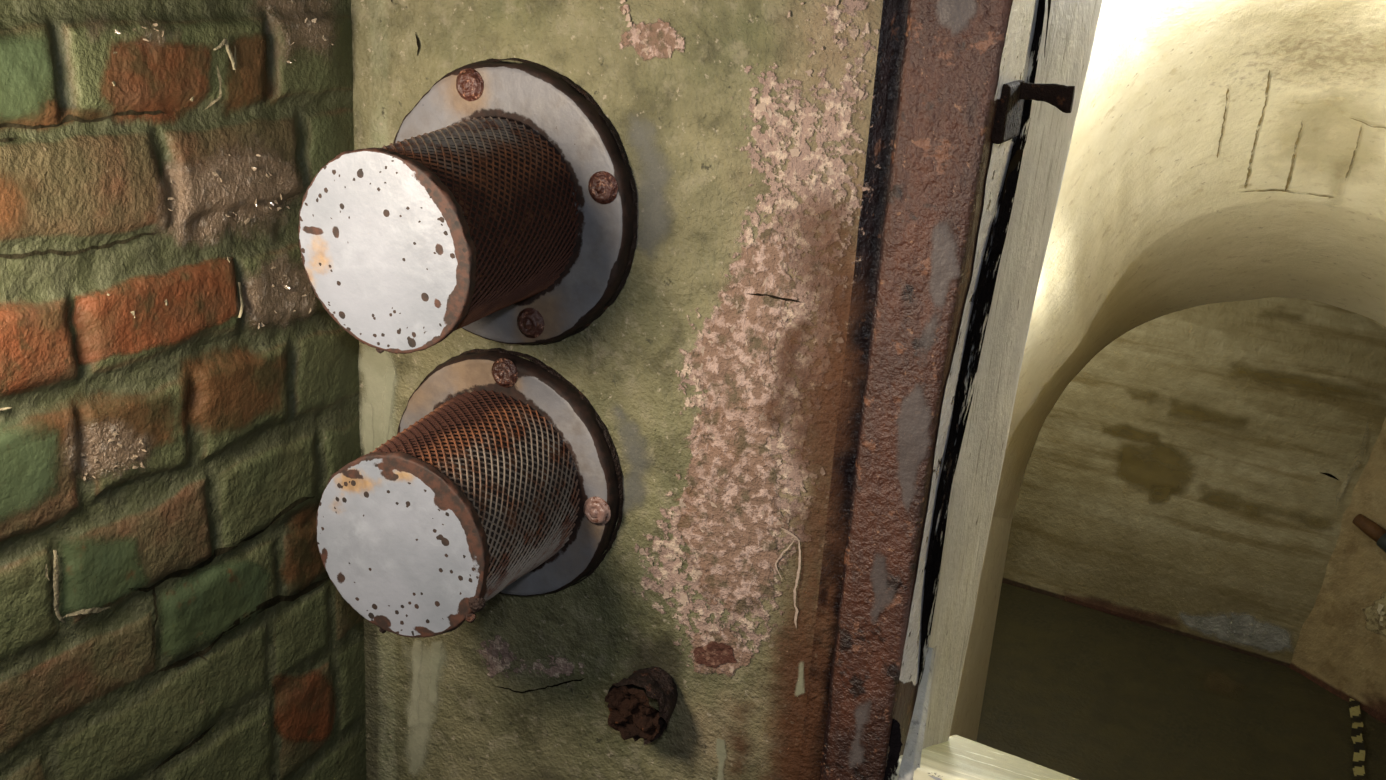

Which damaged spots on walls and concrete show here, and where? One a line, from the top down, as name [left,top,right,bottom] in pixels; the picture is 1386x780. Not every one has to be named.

crack [0,110,167,142]
peeling [632,0,881,677]
leakage [1104,425,1193,501]
leakage [1202,491,1329,528]
crack [129,496,329,676]